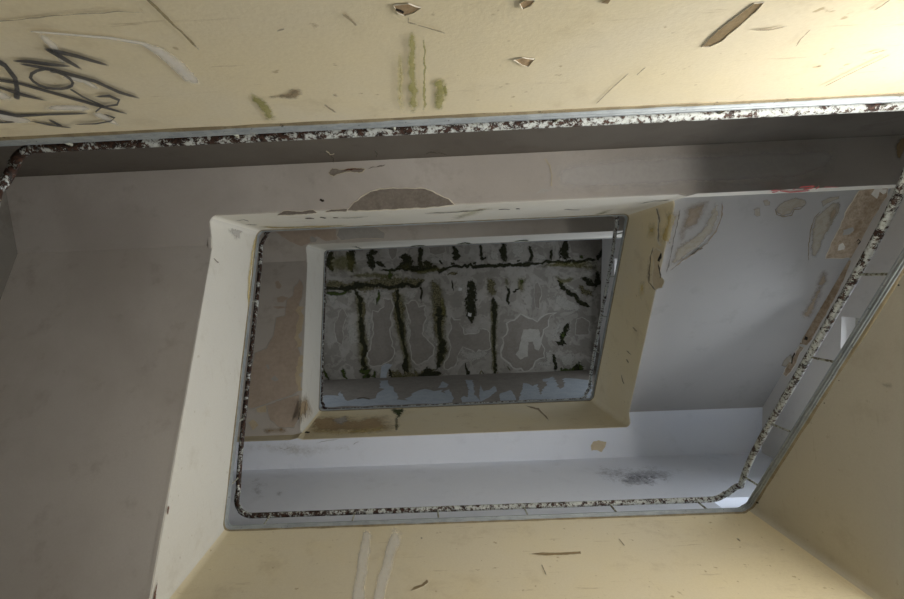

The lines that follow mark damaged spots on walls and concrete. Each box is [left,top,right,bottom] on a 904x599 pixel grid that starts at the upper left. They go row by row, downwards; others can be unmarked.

spalling [701,1,764,47]
spalling [278,187,455,216]
peeling [569,239,602,258]
peeling [444,282,557,372]
peeling [321,298,593,407]